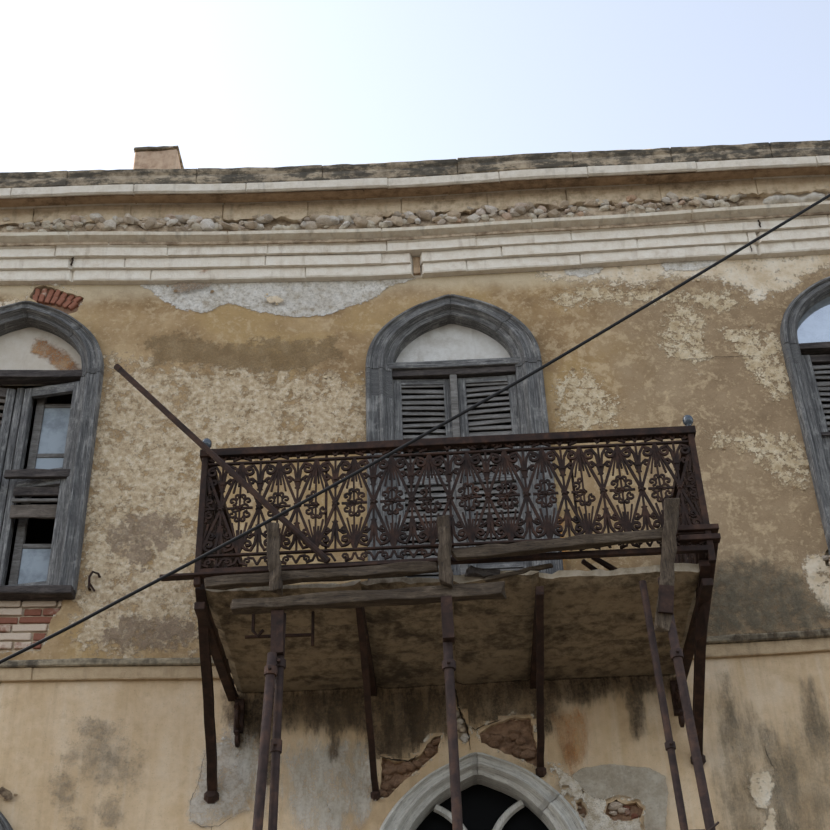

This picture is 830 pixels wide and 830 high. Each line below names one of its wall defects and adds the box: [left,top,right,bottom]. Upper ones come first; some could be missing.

flaking render [140,278,414,317]
flaking render [535,254,830,375]
flaking render [716,324,792,401]
flaking render [704,428,810,491]
flaking render [0,351,366,659]
damp [707,560,830,641]
flaking render [802,551,830,616]
flaking render [379,733,444,799]
flaking render [456,706,537,768]
flaking render [547,762,646,830]
damp [626,690,644,739]
flaking render [746,771,776,830]